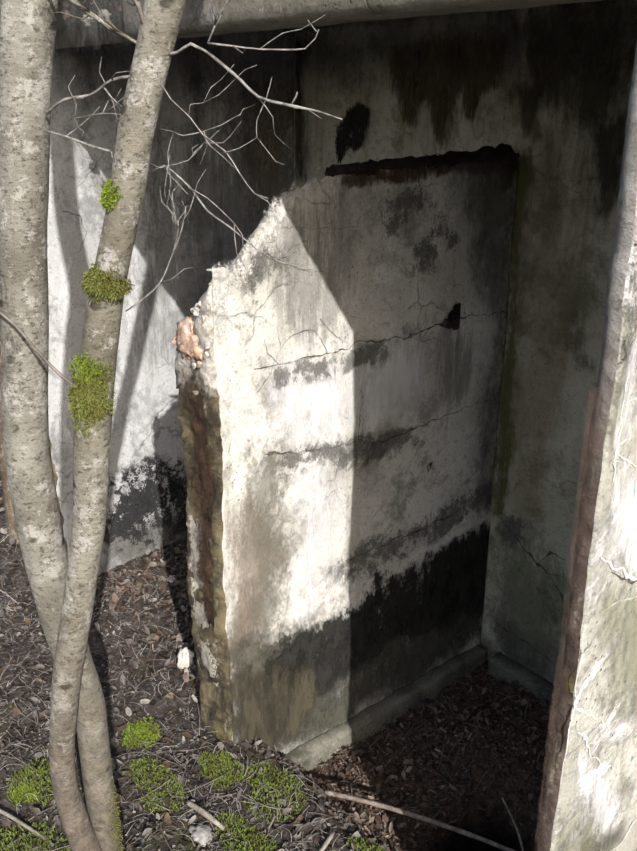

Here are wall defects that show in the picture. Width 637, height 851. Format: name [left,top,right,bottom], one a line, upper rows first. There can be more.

water stain [388,33,503,148]
rust [342,153,520,190]
spalling [172,301,210,373]
crack [257,310,505,407]
water stain [328,165,514,582]
spalling [434,293,471,339]
crack [265,448,319,456]
crack [612,357,637,502]
water stain [101,517,187,571]
water stain [229,617,318,693]
water stain [274,602,483,755]
crack [561,557,637,780]